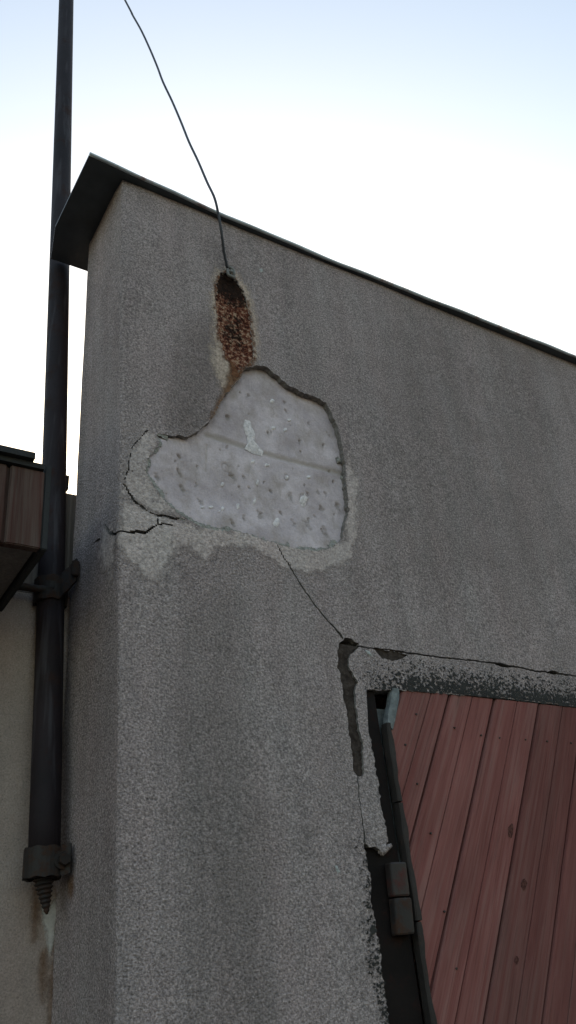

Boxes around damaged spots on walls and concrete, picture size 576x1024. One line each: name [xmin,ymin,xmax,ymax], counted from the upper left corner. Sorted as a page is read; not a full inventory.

rust [209,270,259,419]
spalling [98,369,361,584]
peeling [337,642,576,777]